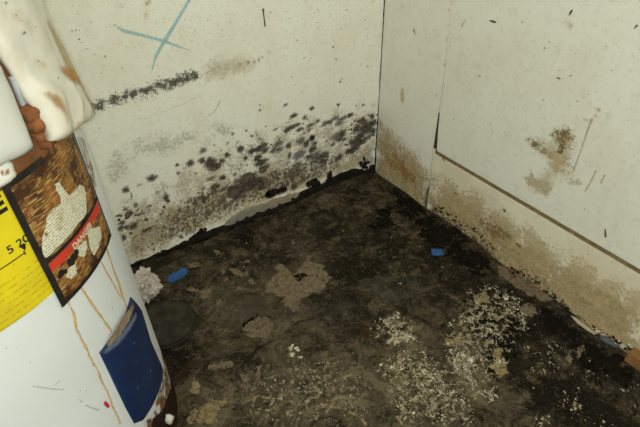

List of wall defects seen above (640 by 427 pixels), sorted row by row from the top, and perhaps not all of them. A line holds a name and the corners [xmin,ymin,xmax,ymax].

leakage [49,22,200,112]
leakage [116,106,378,256]
leakage [528,126,574,172]
leakage [368,177,640,392]